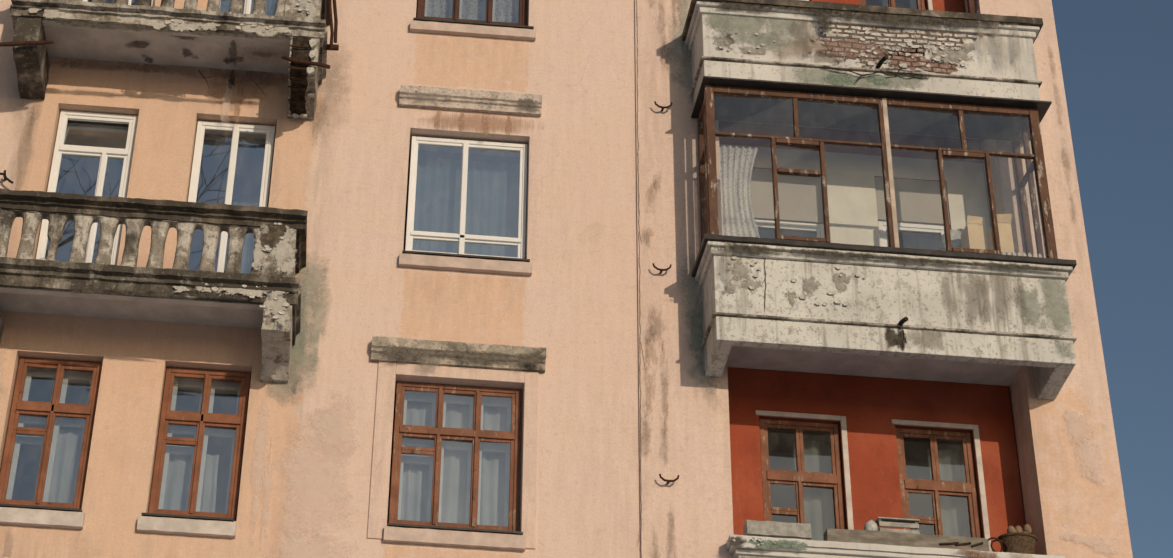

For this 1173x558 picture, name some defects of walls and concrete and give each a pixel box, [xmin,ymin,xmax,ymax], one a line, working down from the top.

peeling [294,0,318,19]
spalling [28,8,317,118]
flaking render [803,21,995,74]
crack [636,0,645,435]
peeling [252,222,297,276]
spalling [70,283,290,326]
water stain [270,264,327,395]
water stain [885,327,907,351]
water stain [1018,278,1072,354]